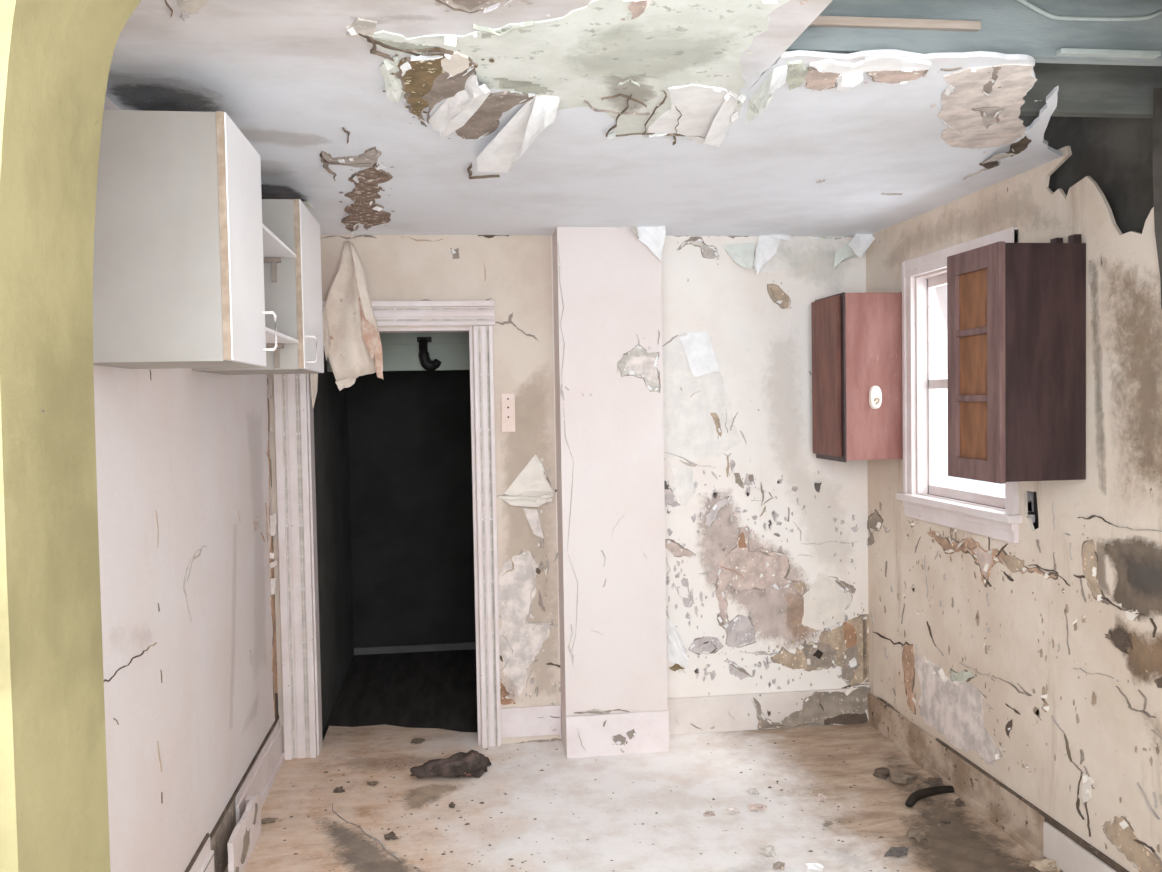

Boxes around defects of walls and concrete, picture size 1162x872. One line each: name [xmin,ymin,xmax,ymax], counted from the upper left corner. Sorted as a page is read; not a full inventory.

peeling [165,0,210,22]
peeling [345,0,1042,180]
flaking render [320,127,395,236]
leakage [1119,280,1162,470]
crack [104,642,163,683]
peeling [496,454,561,708]
flaking render [610,318,1157,775]
crack [873,632,903,645]
crack [924,556,1030,696]
crack [1036,500,1162,740]
crack [1051,715,1095,837]
flaking render [1095,797,1162,872]